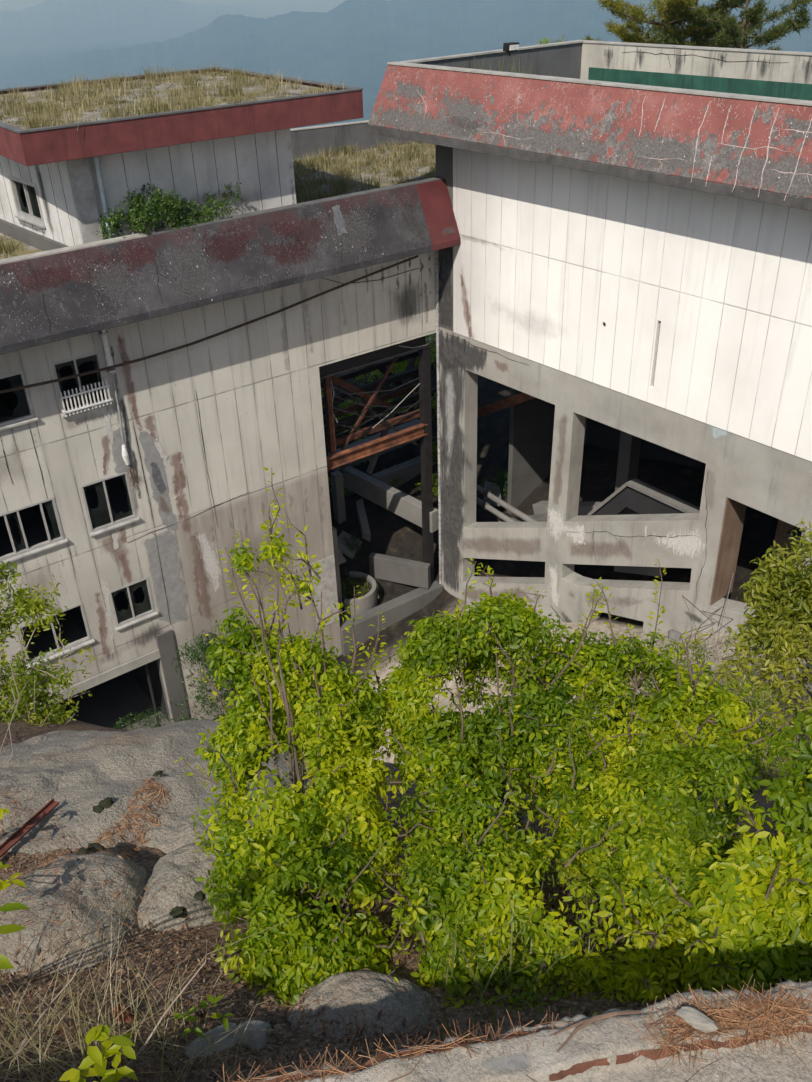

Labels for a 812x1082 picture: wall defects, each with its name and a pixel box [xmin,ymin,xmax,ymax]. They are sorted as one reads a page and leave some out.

peeling [378,80,487,140]
peeling [505,125,698,176]
crack [639,96,812,201]
peeling [721,113,812,199]
corrosion [119,339,155,437]
damp [397,247,487,591]
corrosion [172,452,189,531]
corrosion [121,555,131,581]
crack [575,469,709,604]
peeling [644,526,706,559]
corrosion [96,594,109,656]